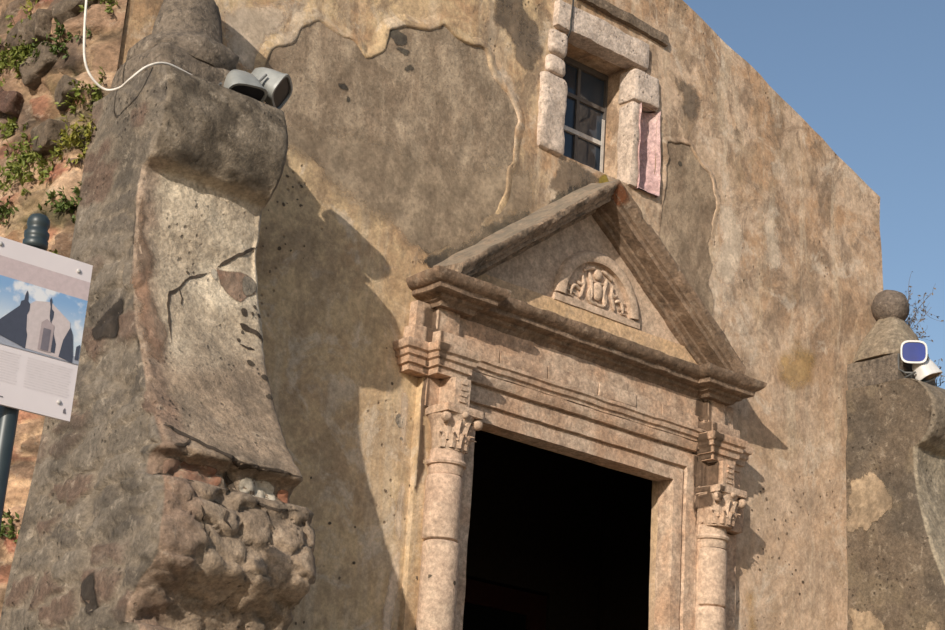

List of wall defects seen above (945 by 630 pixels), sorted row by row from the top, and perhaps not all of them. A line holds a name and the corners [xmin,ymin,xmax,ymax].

flaking render [252,7,532,266]
flaking render [653,136,722,322]
crack [167,247,257,343]
flaking render [211,268,260,318]
crack [240,323,263,350]